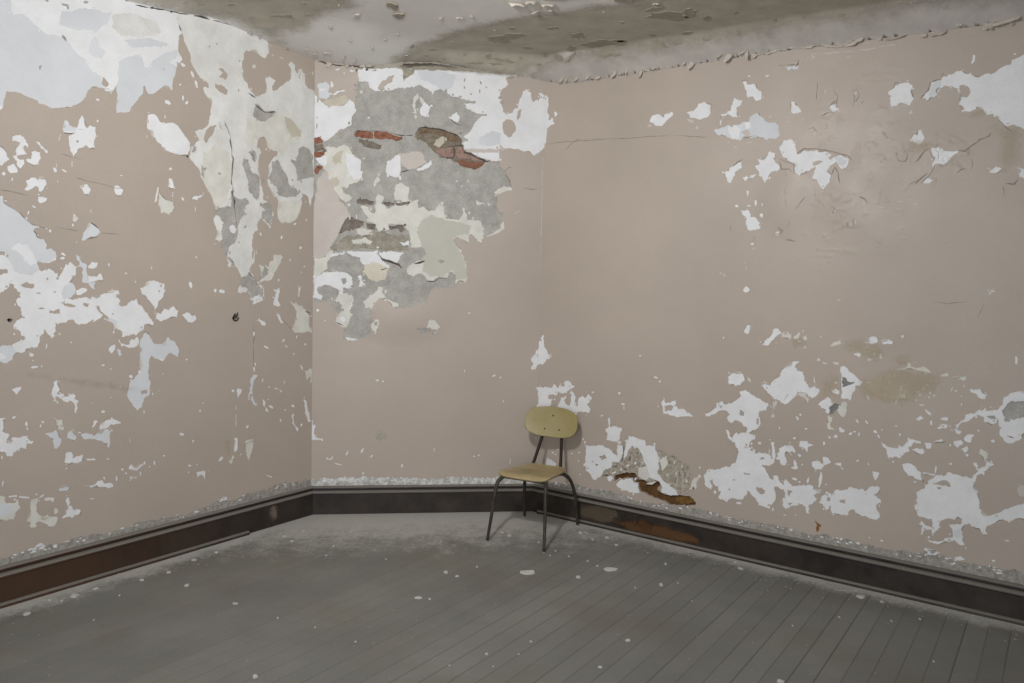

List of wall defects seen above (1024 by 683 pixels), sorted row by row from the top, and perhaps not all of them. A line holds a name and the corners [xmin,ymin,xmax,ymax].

peeling [645,3,714,48]
peeling [647,112,673,127]
peeling [687,75,853,249]
peeling [896,130,991,185]
peeling [888,53,1024,132]
flaking render [0,0,628,413]
peeling [854,335,904,361]
flaking render [0,358,1024,585]